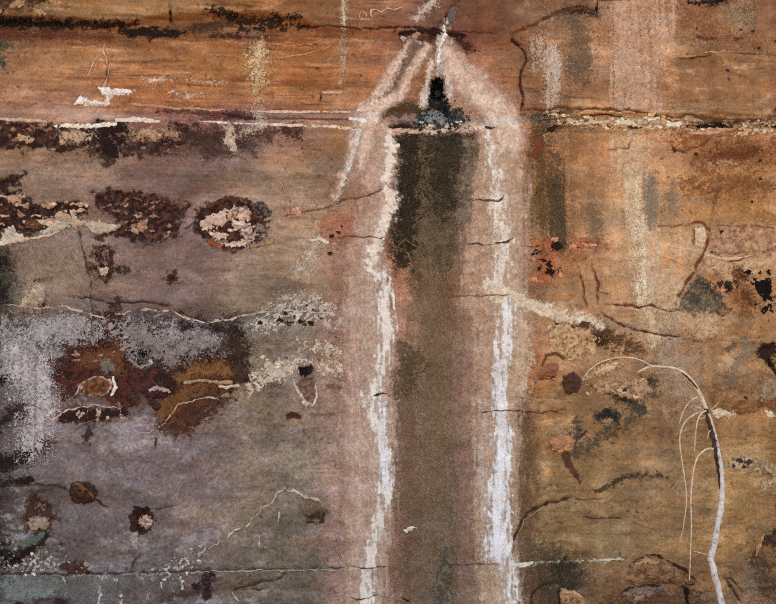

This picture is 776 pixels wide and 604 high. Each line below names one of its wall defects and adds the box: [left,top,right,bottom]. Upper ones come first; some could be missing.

crack [301,0,776,152]
water stain [0,117,160,129]
water stain [688,125,730,134]
spalling [685,119,776,135]
water stain [730,114,776,137]
spalling [0,170,280,254]
water stain [671,232,776,278]
water stain [0,245,230,490]
rust [36,295,264,454]